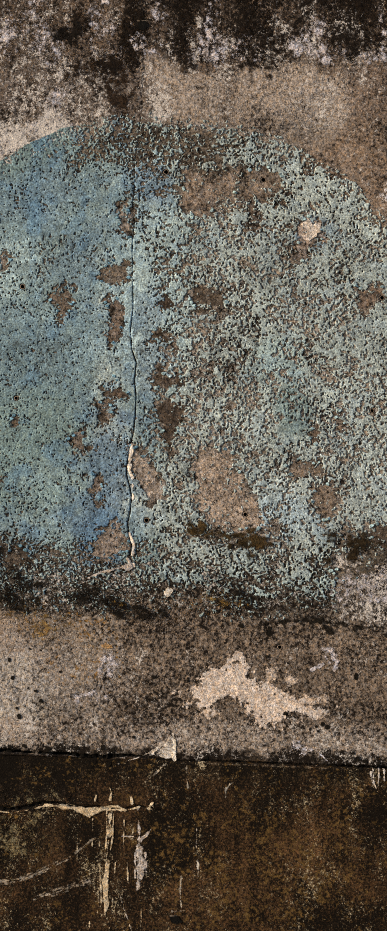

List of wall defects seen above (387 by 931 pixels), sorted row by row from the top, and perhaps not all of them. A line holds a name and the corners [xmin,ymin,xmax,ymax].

damp [0,0,387,135]
peeling [180,163,286,224]
peeling [99,259,132,344]
peeling [190,445,267,534]
damp [0,567,44,613]
damp [63,532,182,622]
damp [227,534,269,560]
damp [311,530,386,588]
spalling [172,648,338,731]
crack [0,745,387,777]
crack [0,798,160,821]